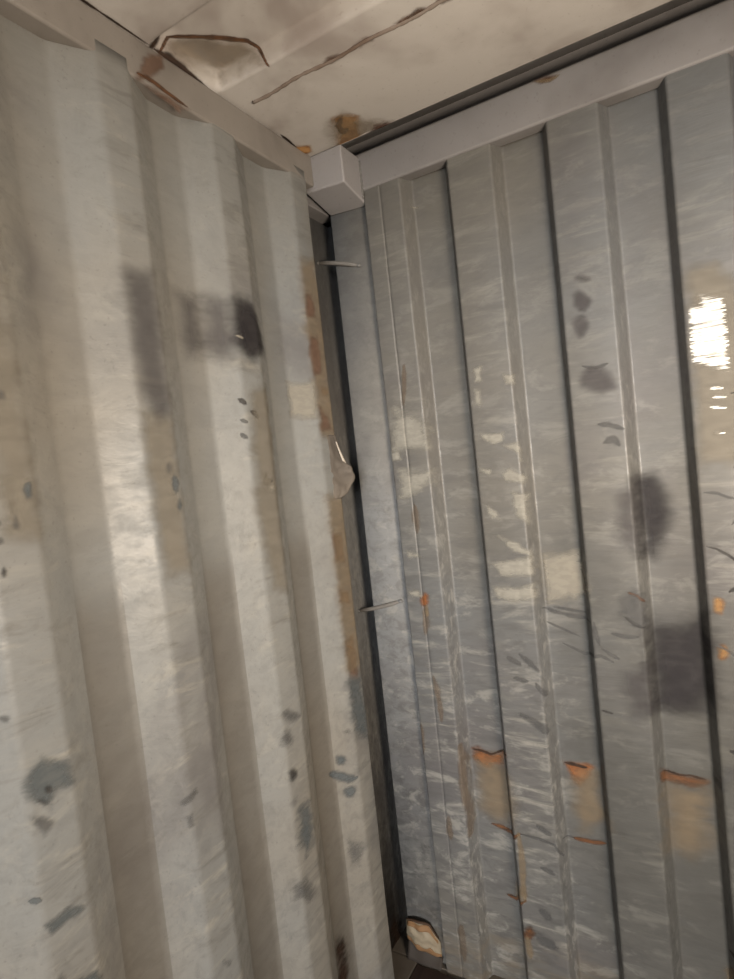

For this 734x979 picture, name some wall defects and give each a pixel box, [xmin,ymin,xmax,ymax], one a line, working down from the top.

rust [81,0,269,112]
rust [334,116,359,145]
leakage [636,477,668,551]
leakage [652,622,712,711]
rust [473,749,506,766]
rust [564,762,593,782]
rust [661,770,708,787]